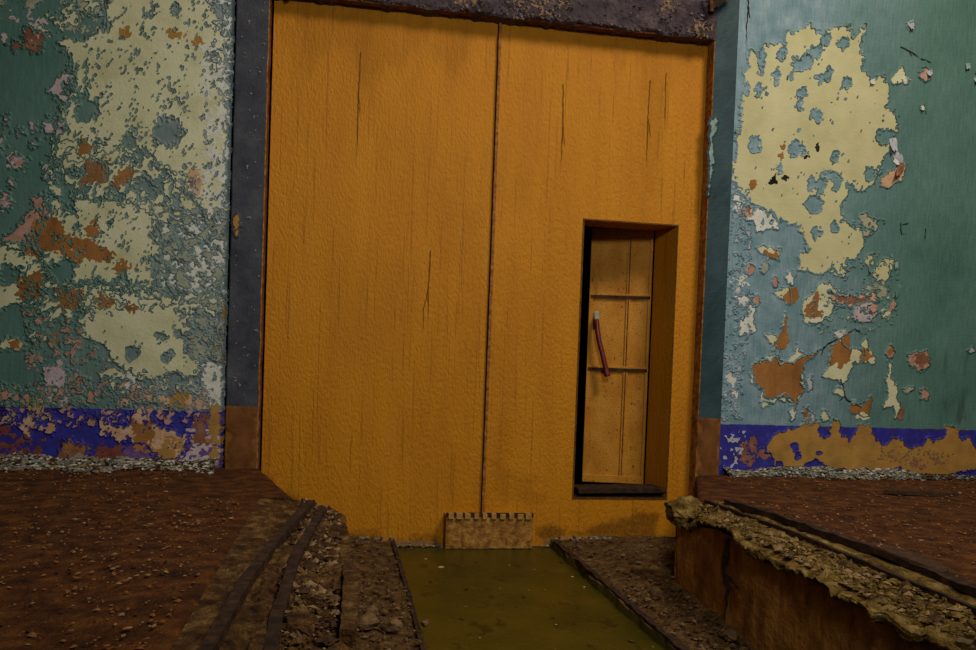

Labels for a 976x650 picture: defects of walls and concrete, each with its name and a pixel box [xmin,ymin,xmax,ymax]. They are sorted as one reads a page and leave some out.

peeling [0,0,260,468]
crack [811,328,862,356]
peeling [721,20,976,475]